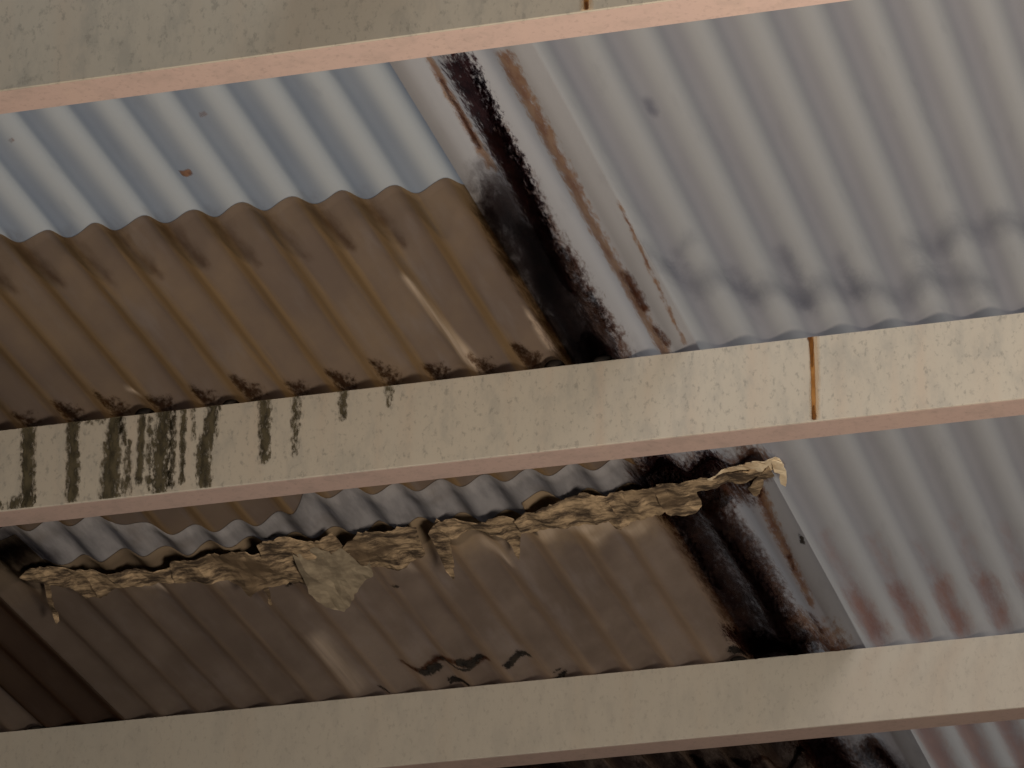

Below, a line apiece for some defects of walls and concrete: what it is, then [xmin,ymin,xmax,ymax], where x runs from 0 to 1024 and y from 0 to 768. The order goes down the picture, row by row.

corrosion [434,52,631,365]
corrosion [619,271,648,314]
water stain [0,413,37,510]
water stain [54,389,221,503]
water stain [230,375,272,464]
water stain [286,382,308,454]
water stain [325,369,357,421]
water stain [370,361,399,408]
water stain [512,344,541,369]
corrosion [807,336,818,420]
corrosion [19,445,841,659]
corrosion [789,736,901,768]